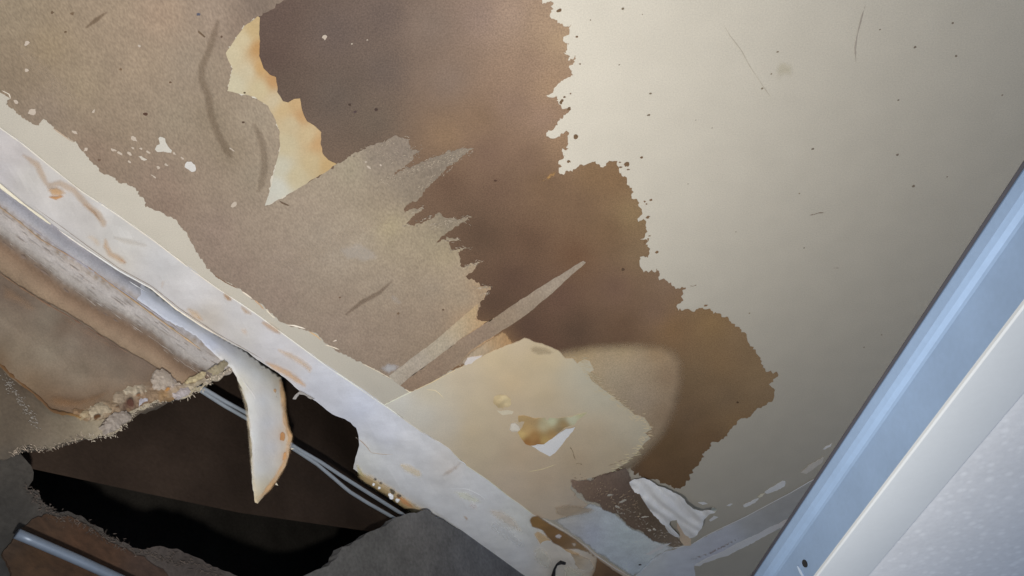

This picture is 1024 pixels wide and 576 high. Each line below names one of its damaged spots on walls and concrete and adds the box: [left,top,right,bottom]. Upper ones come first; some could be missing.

peeling [0,0,494,392]
water stain [259,0,778,489]
peeling [571,468,683,547]